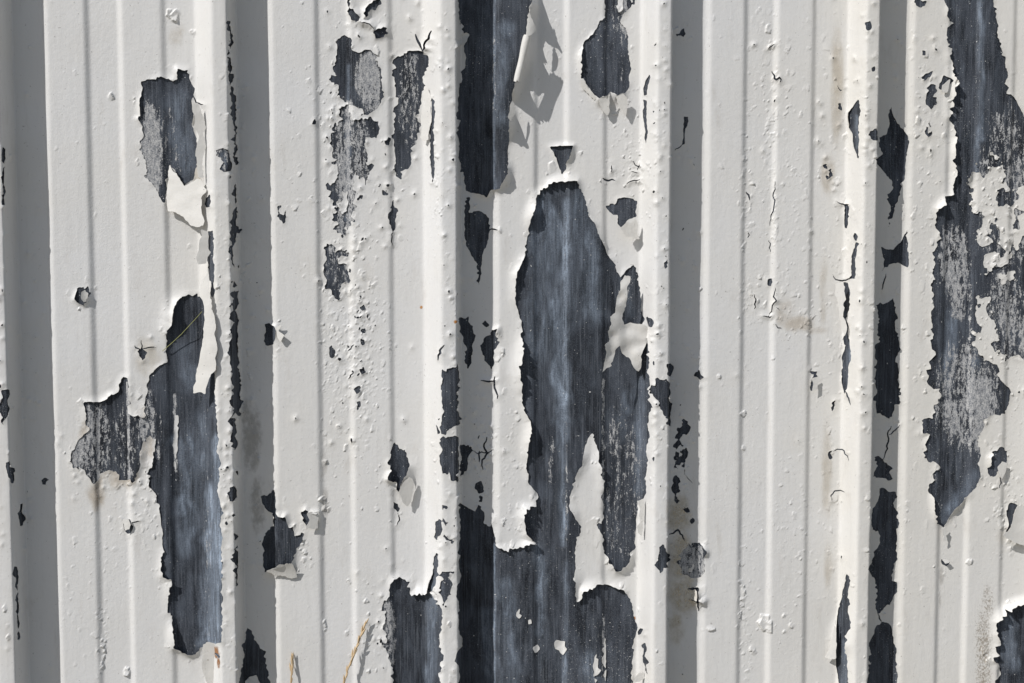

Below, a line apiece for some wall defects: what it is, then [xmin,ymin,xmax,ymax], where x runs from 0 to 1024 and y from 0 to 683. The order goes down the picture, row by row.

peeling [65,17,275,683]
peeling [256,485,323,578]
peeling [312,0,537,420]
peeling [376,141,695,683]
peeling [574,0,640,116]
peeling [859,0,1024,683]